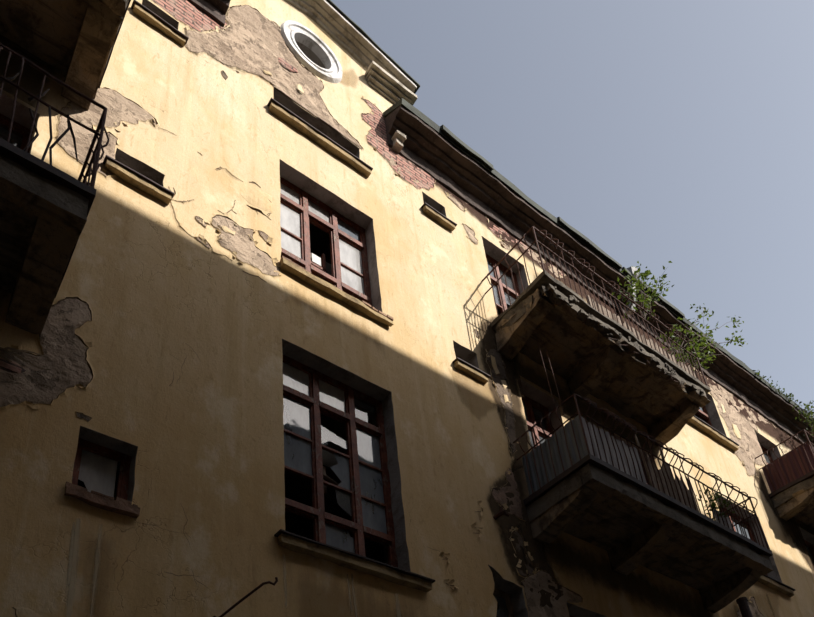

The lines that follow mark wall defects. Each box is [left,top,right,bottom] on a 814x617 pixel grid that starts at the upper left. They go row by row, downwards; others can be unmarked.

flaking render [52,86,161,180]
flaking render [150,0,474,213]
crack [167,186,267,283]
crack [197,151,272,220]
flaking render [194,212,282,278]
flaking render [462,223,478,245]
flaking render [486,217,567,278]
flaking render [0,295,96,413]
flaking render [486,349,519,457]
flaking render [694,368,787,478]
flaking render [490,468,583,617]